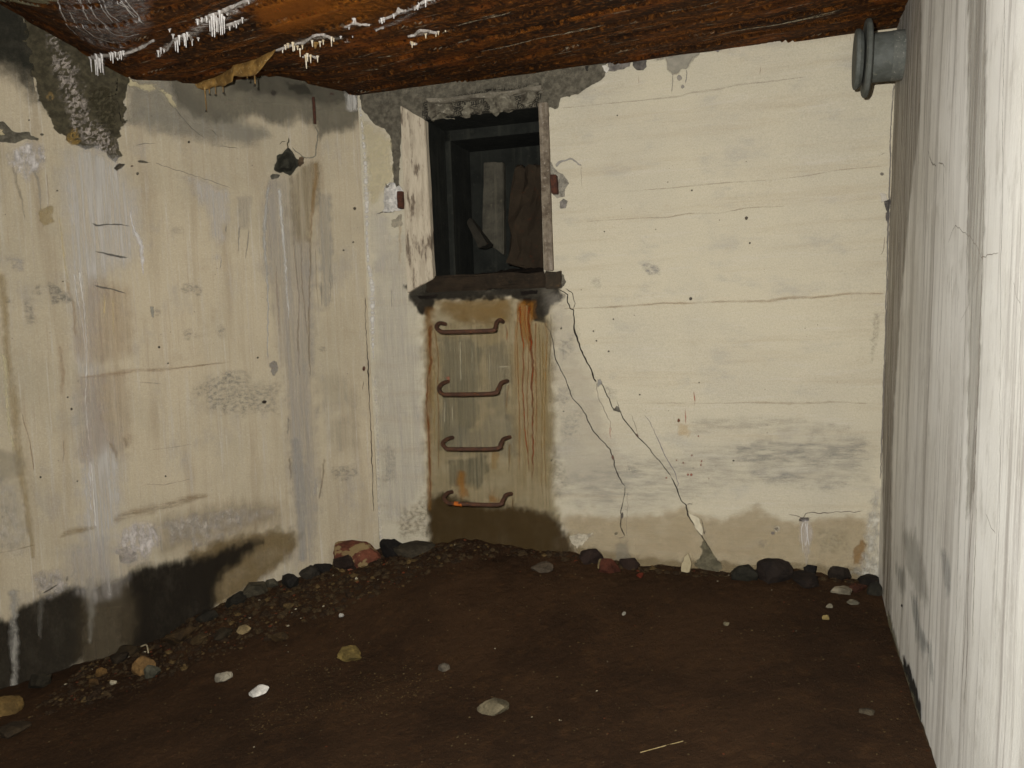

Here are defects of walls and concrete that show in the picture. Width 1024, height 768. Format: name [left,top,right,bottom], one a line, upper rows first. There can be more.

efflorescence [0,0,251,75]
efflorescence [276,0,435,69]
efflorescence [408,29,446,48]
spalling [0,16,699,187]
spalling [550,158,581,209]
rust [426,330,449,498]
rust [506,302,548,504]
crack [546,289,722,572]
water stain [0,359,303,689]
water stain [428,493,593,552]
water stain [611,555,698,569]